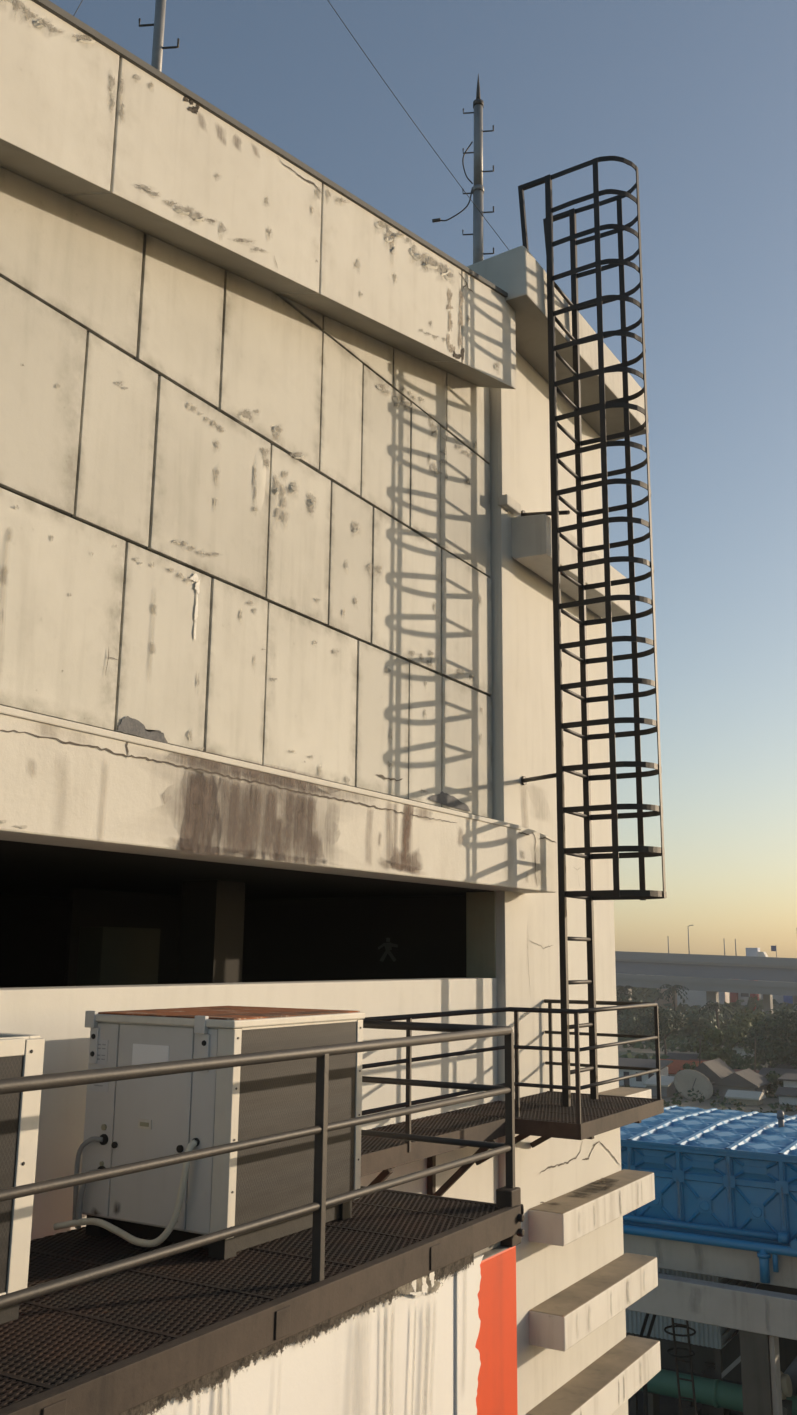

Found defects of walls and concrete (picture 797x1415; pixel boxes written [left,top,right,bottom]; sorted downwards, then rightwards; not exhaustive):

peeling [136,184,271,252]
spalling [117,716,168,744]
crack [0,730,457,823]
spalling [421,789,471,812]
corrosion [396,805,418,872]
damp [383,1315,394,1415]